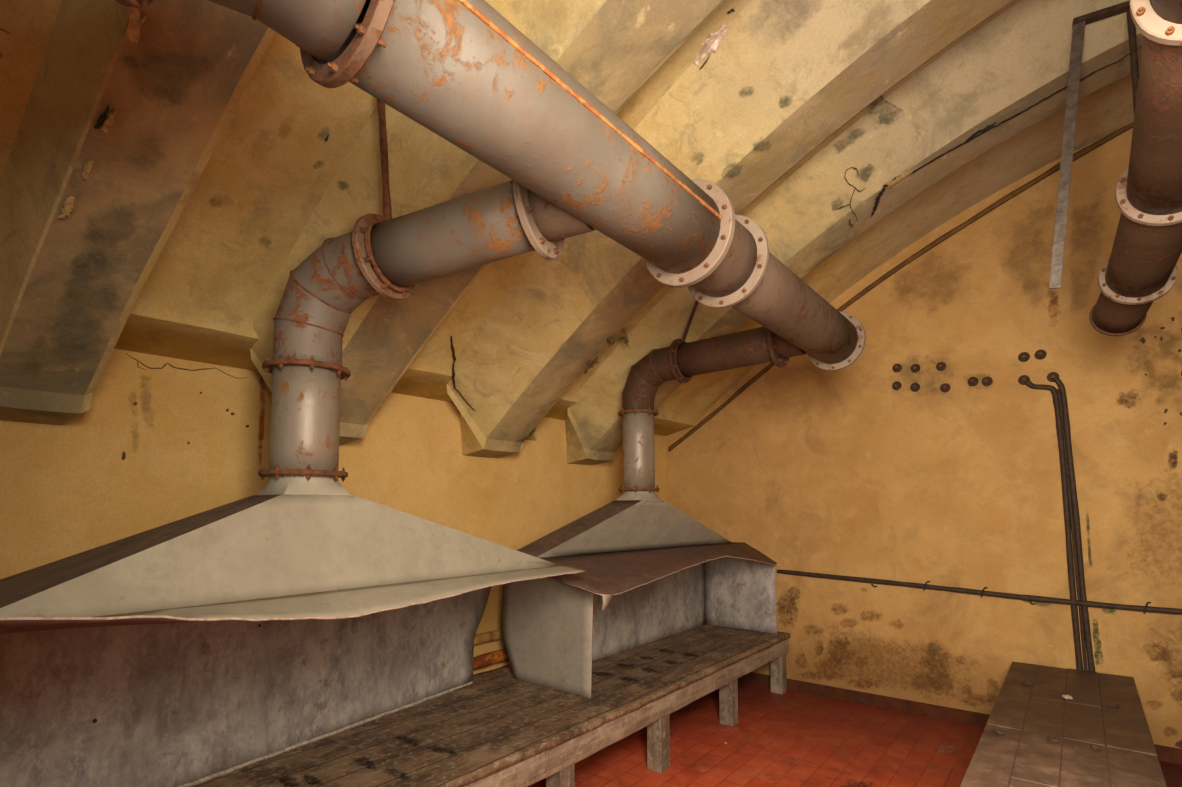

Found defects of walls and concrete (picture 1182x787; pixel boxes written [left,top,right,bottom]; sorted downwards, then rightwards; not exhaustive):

crack [837,46,1142,226]